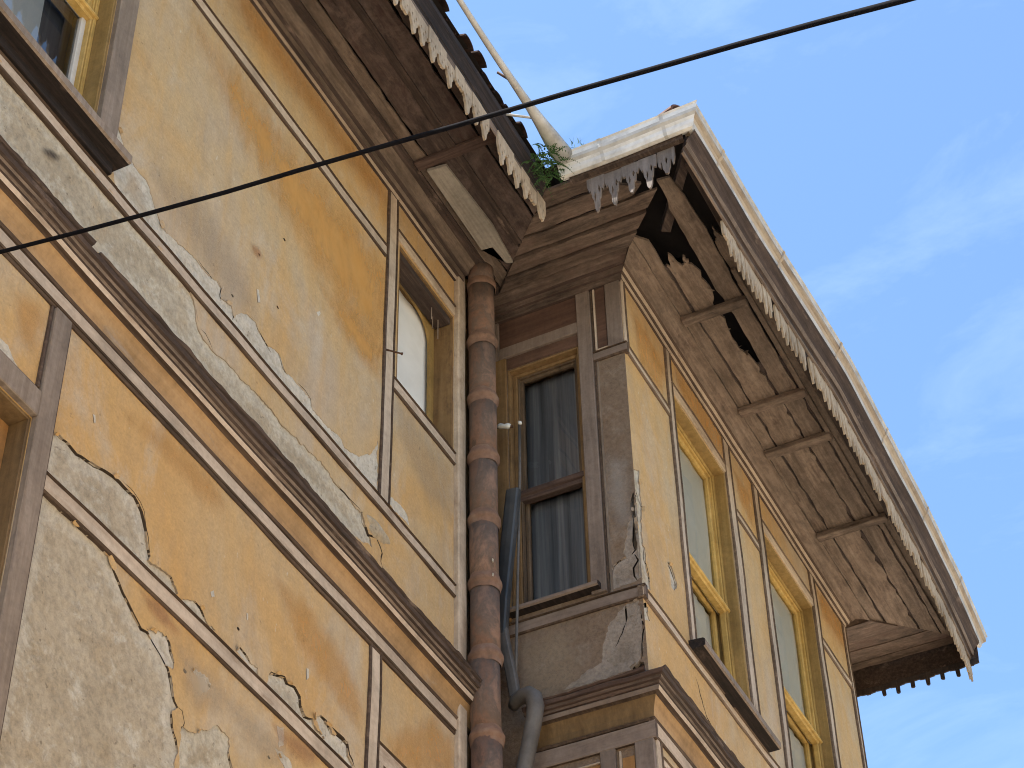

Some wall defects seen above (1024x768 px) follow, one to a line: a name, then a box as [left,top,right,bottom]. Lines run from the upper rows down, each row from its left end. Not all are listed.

spalling [0,60,378,545]
spalling [0,496,231,768]
spalling [47,432,215,630]
spalling [236,645,352,768]
peeling [564,598,649,690]
crack [631,500,639,580]